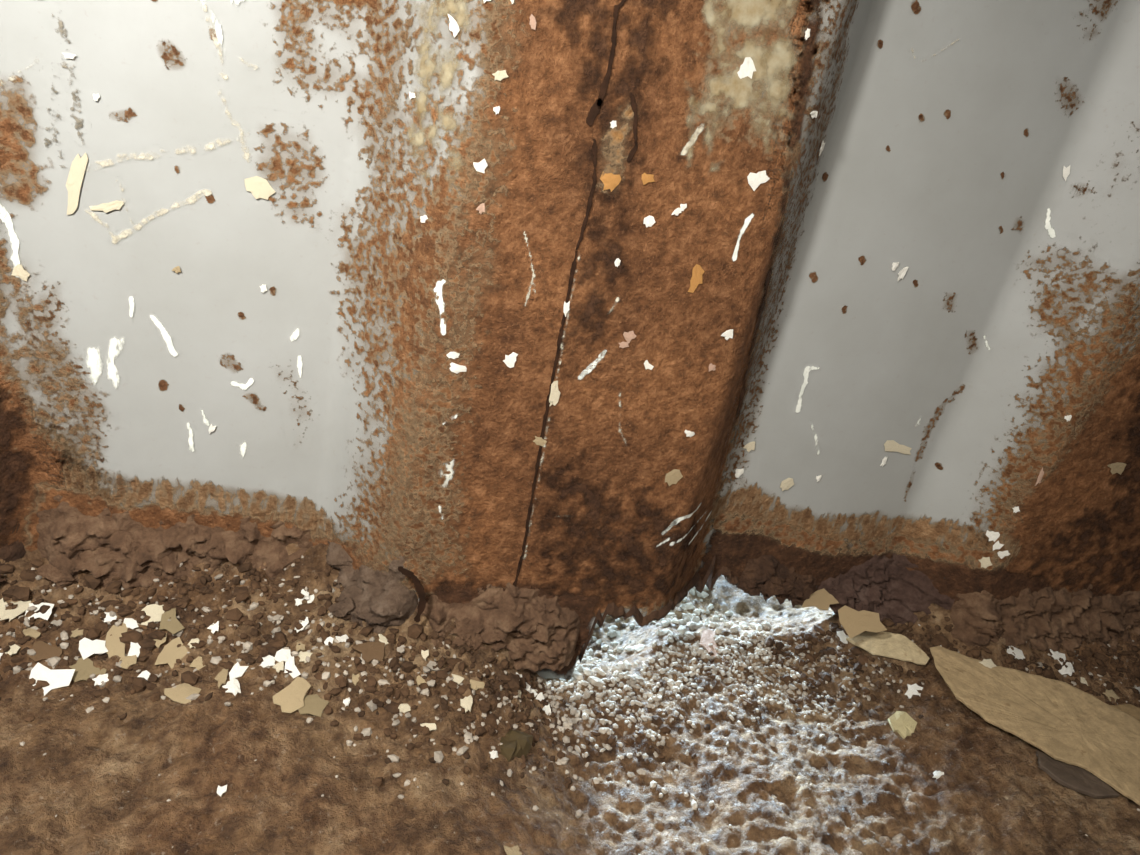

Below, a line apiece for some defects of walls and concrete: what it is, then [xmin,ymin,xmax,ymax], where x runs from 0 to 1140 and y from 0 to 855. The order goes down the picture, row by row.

corrosion [0,0,1140,680]
crack [513,0,638,587]